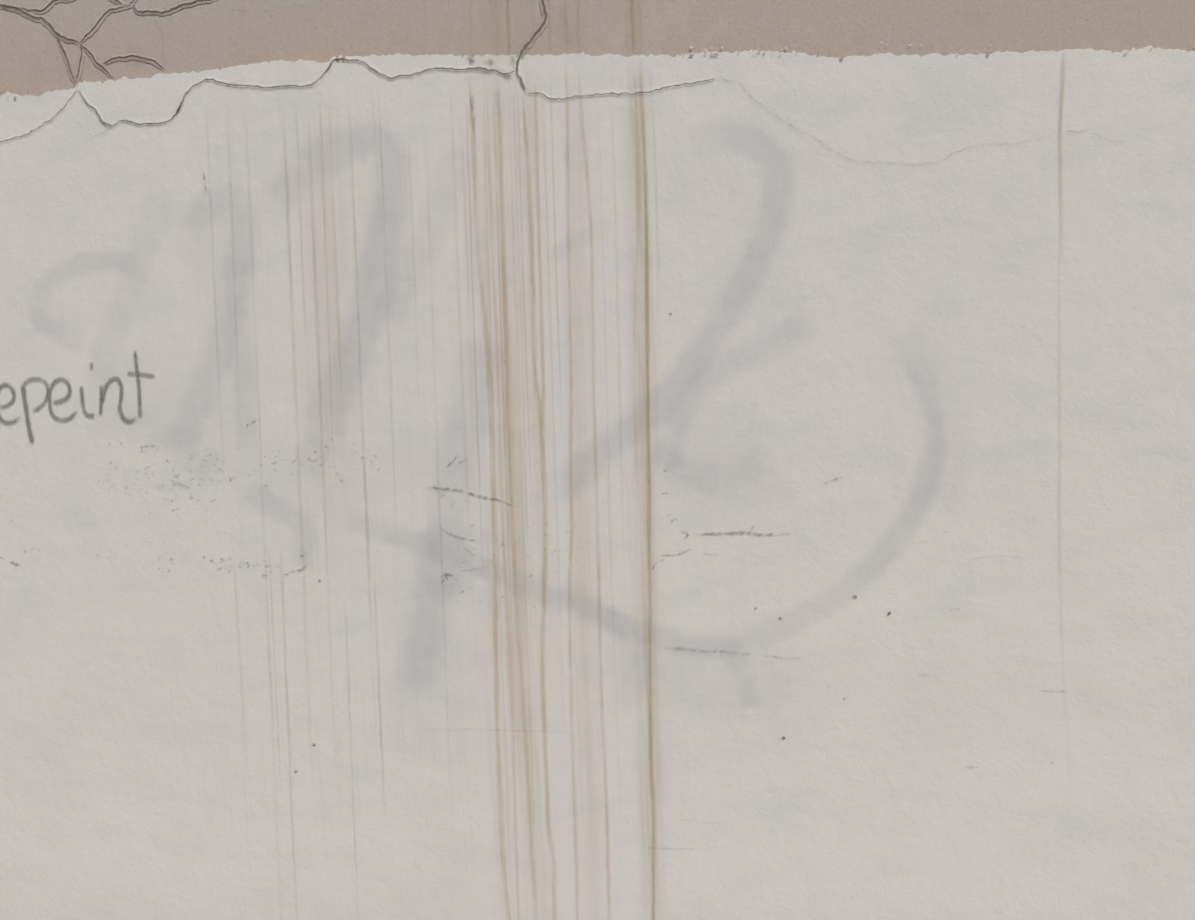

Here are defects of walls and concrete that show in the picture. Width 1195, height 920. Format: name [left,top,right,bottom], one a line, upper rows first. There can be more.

crack [0,0,715,145]